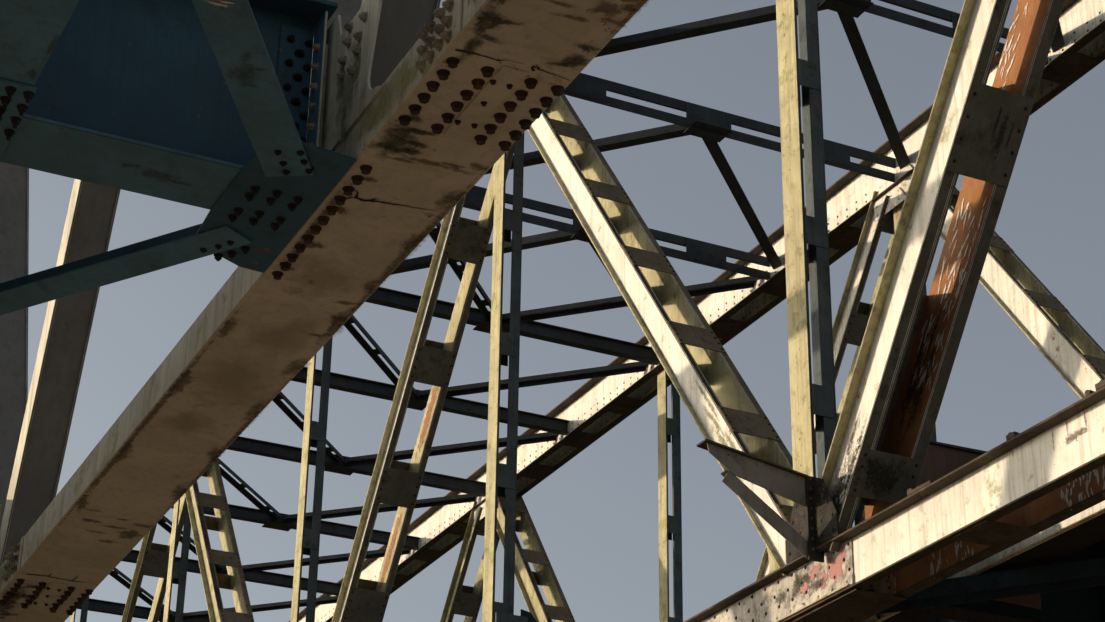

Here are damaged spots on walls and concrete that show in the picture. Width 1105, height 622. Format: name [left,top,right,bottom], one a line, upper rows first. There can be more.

damp [460,0,522,60]
damp [553,45,598,67]
damp [546,0,638,27]
peeling [999,3,1028,90]
peeling [912,197,987,389]
damp [60,312,237,543]
damp [173,402,268,496]
peeling [1061,466,1105,510]